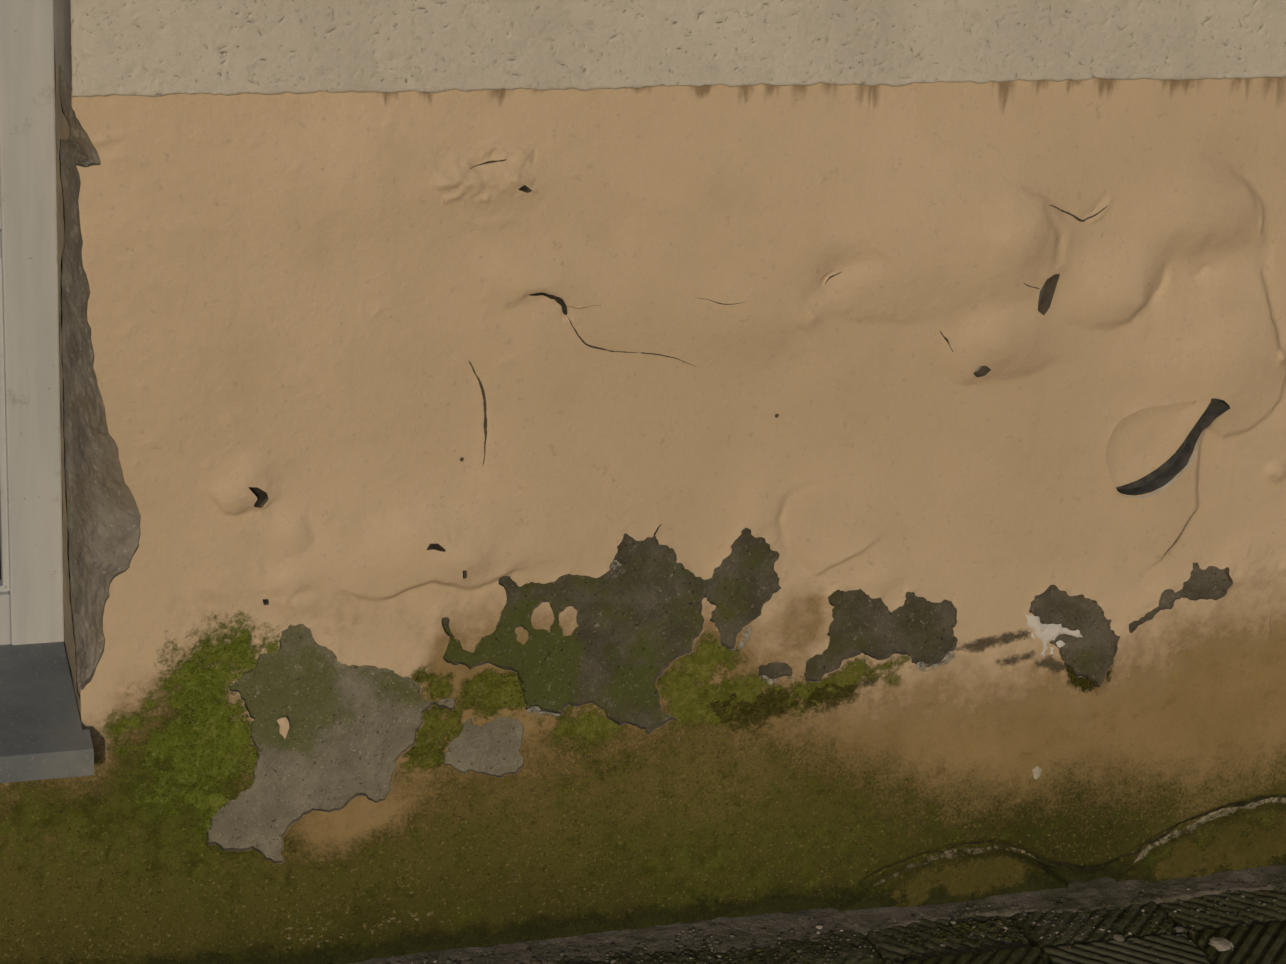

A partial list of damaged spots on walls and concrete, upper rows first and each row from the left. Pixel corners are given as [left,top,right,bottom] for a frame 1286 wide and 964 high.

flaking render [58,65,141,694]
crack [469,361,487,467]
crack [530,292,694,366]
peeling [441,524,781,778]
peeling [759,589,958,685]
peeling [1029,563,1233,687]
damp [0,688,193,807]
peeling [206,624,457,863]
damp [217,598,1286,864]
crack [867,795,1286,886]
damp [147,864,1165,964]